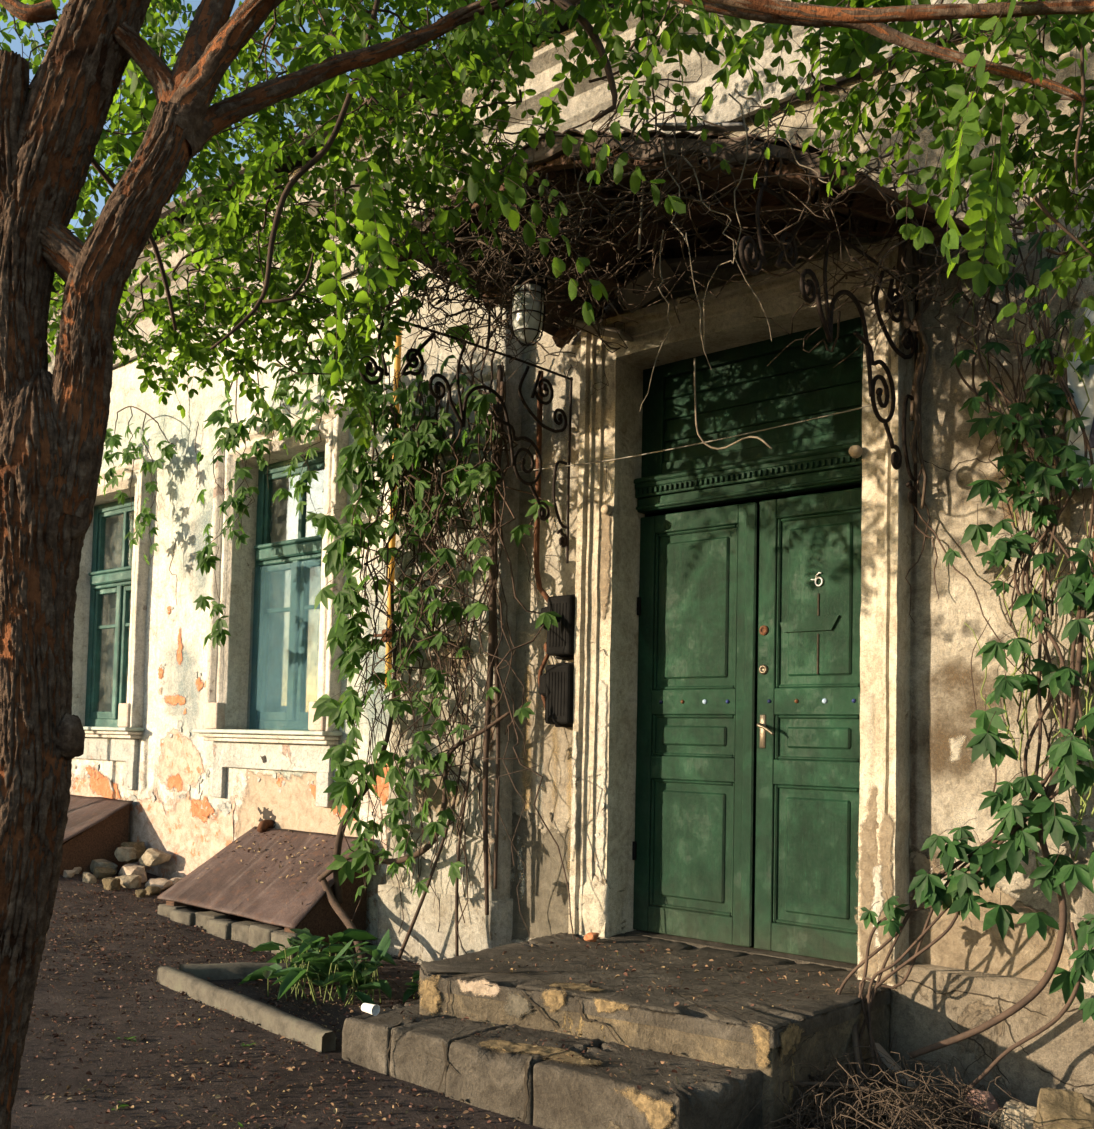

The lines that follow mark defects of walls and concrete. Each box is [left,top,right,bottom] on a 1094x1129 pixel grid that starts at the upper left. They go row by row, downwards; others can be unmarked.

flaking render [70,628,357,880]
spalling [751,1023,804,1069]
crack [896,975,1094,1087]
spalling [615,1087,675,1129]